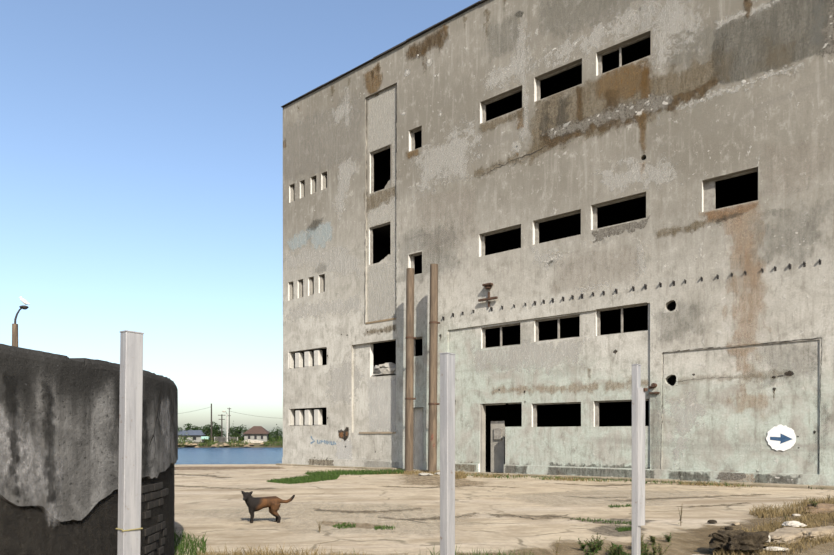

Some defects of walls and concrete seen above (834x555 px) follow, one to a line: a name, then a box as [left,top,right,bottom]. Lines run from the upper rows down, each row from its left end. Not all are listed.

corrosion [365,63,383,96]
corrosion [406,25,448,67]
crack [474,144,546,176]
peeling [485,0,702,156]
corrosion [638,111,647,150]
flaking render [542,63,803,140]
damp [530,0,834,161]
damp [3,372,20,475]
damp [42,381,56,503]
spalling [0,405,118,555]
spalling [140,466,175,555]
damp [160,394,279,470]